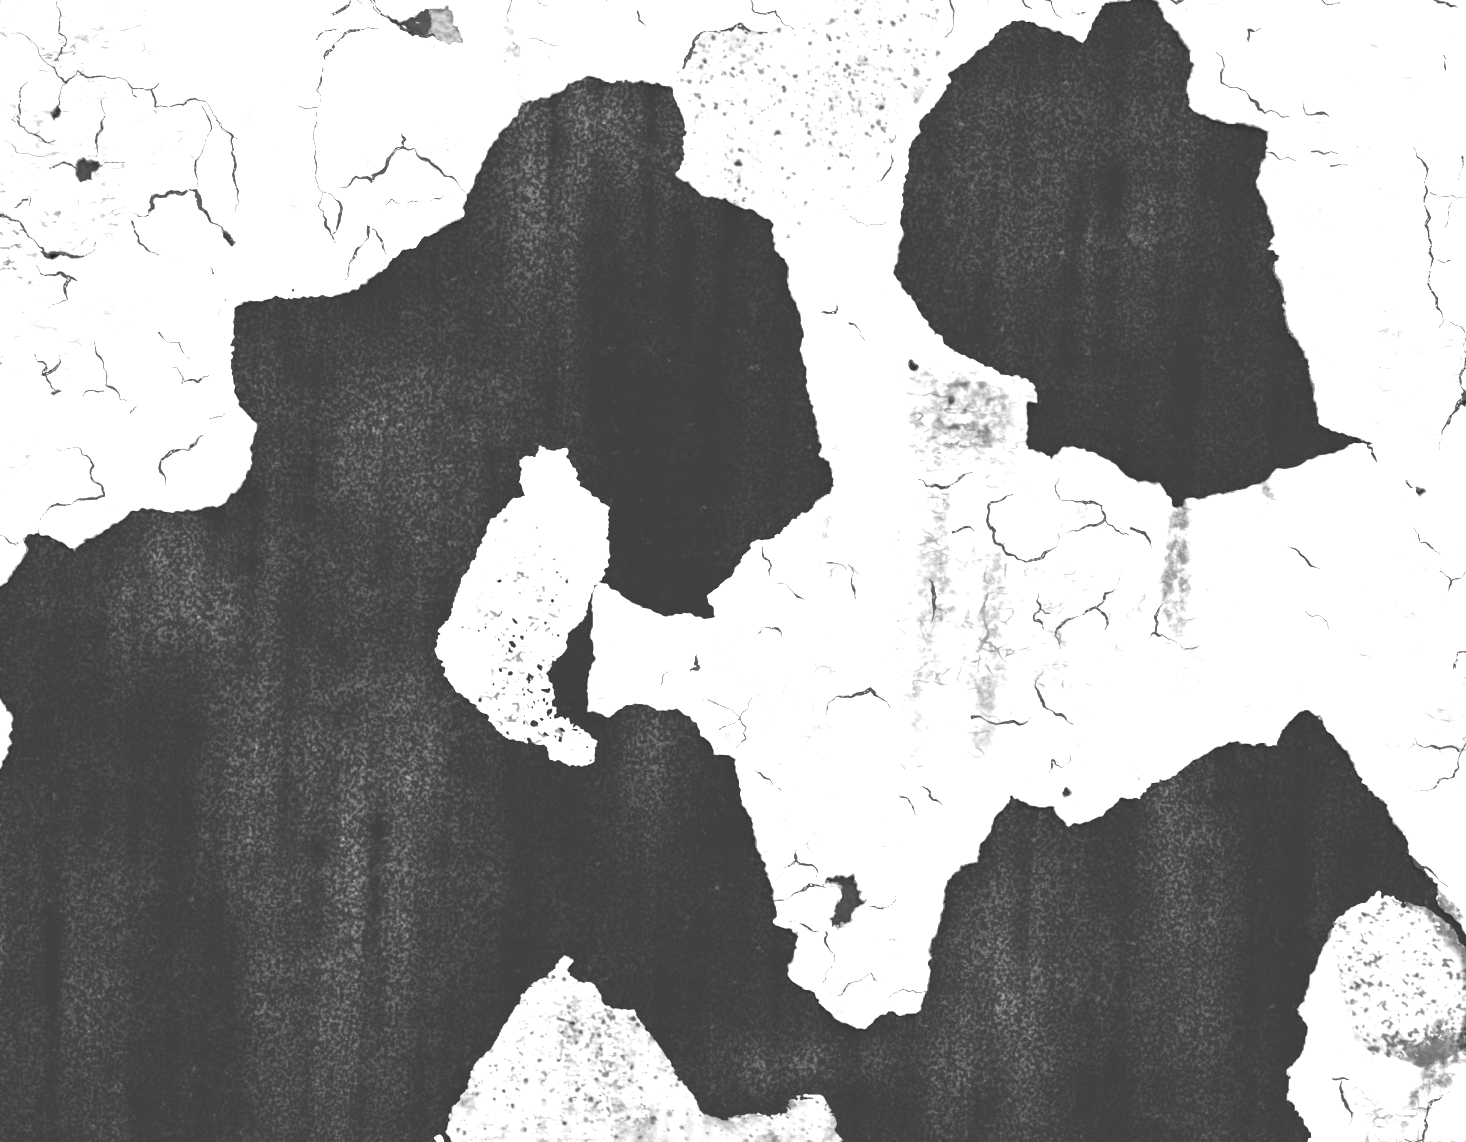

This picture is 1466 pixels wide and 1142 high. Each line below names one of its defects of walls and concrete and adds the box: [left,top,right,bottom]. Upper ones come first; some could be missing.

crack [0,1,240,316]
peeling [151,193,253,310]
crack [298,0,466,280]
peeling [346,150,464,256]
peeling [668,0,956,243]
spalling [893,0,1371,508]
crack [1215,28,1348,167]
crack [1413,147,1466,450]
crack [918,472,1152,649]
crack [970,677,1073,775]
peeling [446,971,843,1142]
peeling [1328,891,1466,1067]